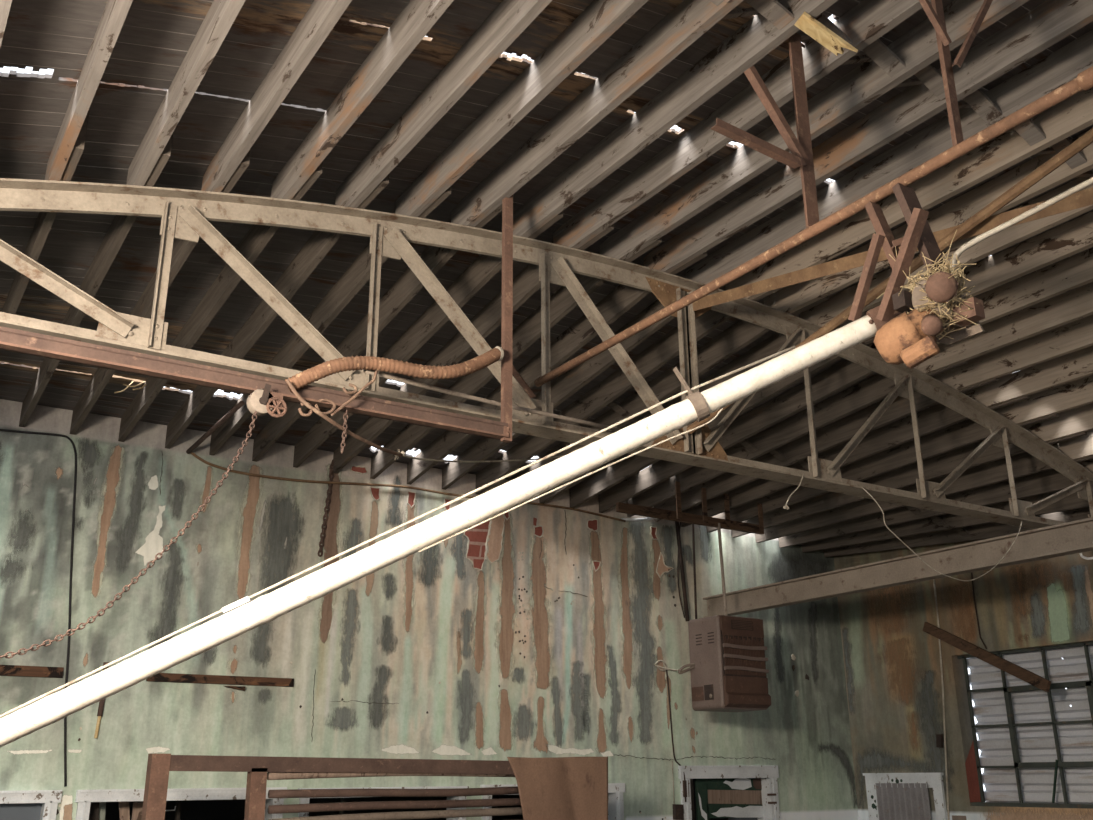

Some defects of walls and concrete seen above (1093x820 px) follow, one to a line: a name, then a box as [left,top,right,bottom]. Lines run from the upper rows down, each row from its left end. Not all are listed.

peeling [148,475,158,490]
water stain [0,509,34,582]
peeling [135,505,165,566]
water stain [342,519,362,558]
spalling [464,521,490,570]
water stain [384,574,395,598]
water stain [341,590,359,685]
water stain [382,617,397,653]
water stain [328,707,356,730]
water stain [369,665,390,728]
water stain [551,661,590,747]
water stain [609,646,621,744]